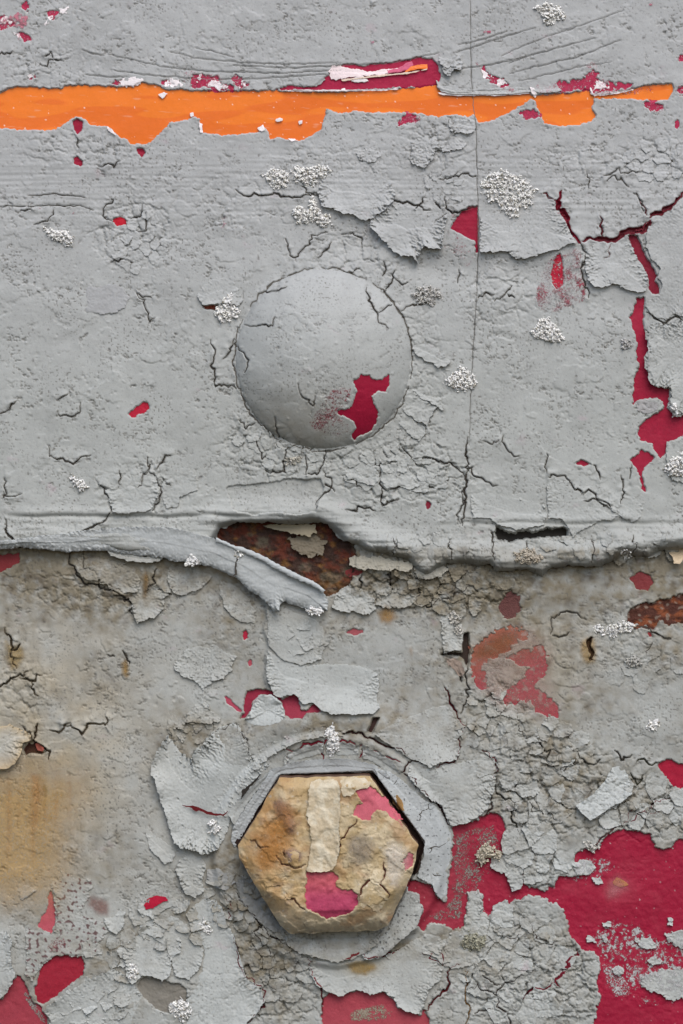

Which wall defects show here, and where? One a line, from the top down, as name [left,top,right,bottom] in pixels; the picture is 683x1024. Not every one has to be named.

crack [3,193,147,232]
crack [545,167,683,298]
peeling [0,53,683,566]
crack [210,3,517,608]
crack [0,628,42,696]
rust [217,521,356,596]
rust [627,594,683,630]
crack [24,717,108,760]
peeling [0,466,683,1024]
crack [287,667,562,876]
crack [517,715,670,845]
crack [356,862,390,900]